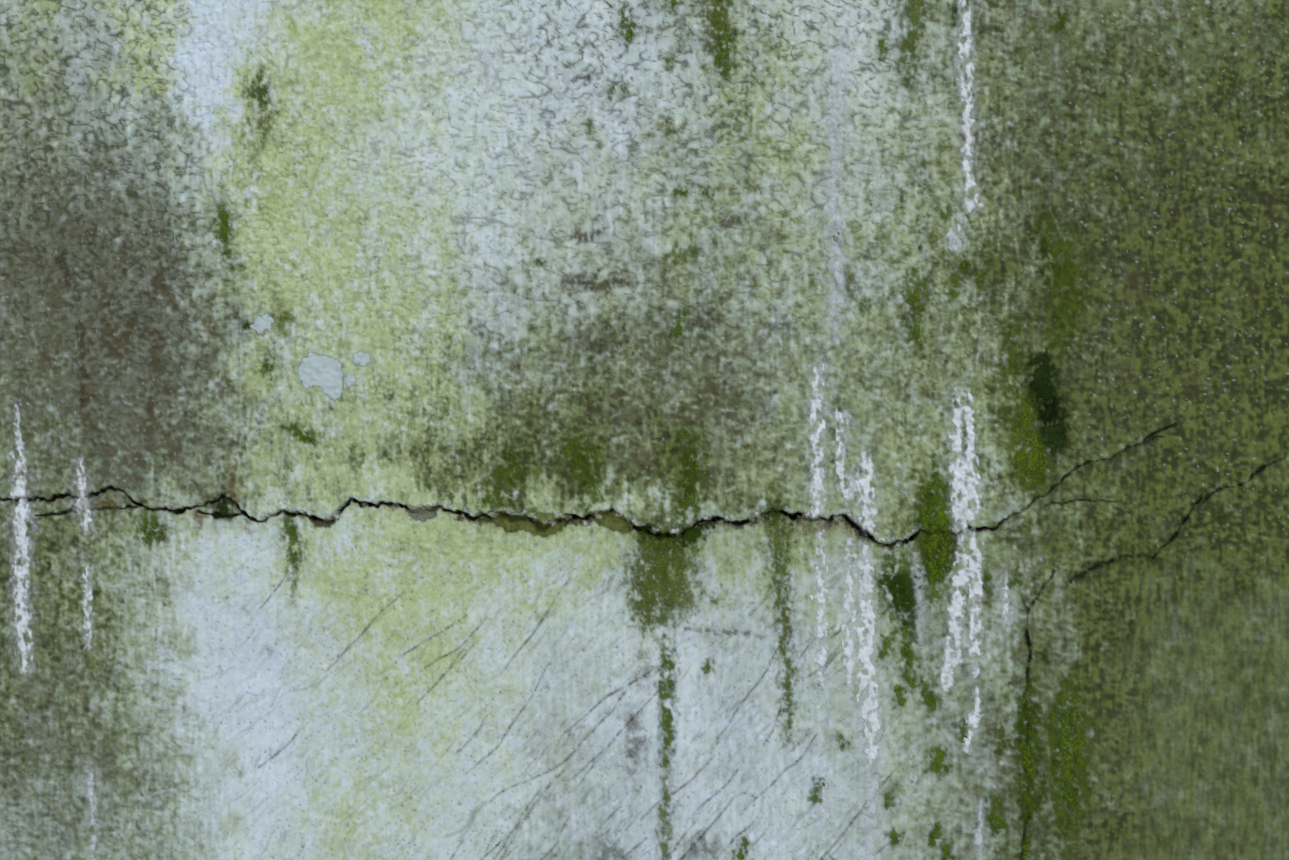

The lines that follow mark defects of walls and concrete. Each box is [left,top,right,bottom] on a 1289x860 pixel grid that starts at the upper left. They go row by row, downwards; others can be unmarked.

leakage [829,49,871,343]
leakage [928,0,985,298]
efflorescence [10,405,33,672]
efflorescence [76,459,92,531]
efflorescence [83,564,93,648]
crack [0,423,1177,550]
leakage [655,635,675,857]
leakage [810,364,918,860]
leakage [901,624,922,688]
efflorescence [941,388,984,753]
leakage [1001,327,1051,491]
crack [1020,458,1283,860]